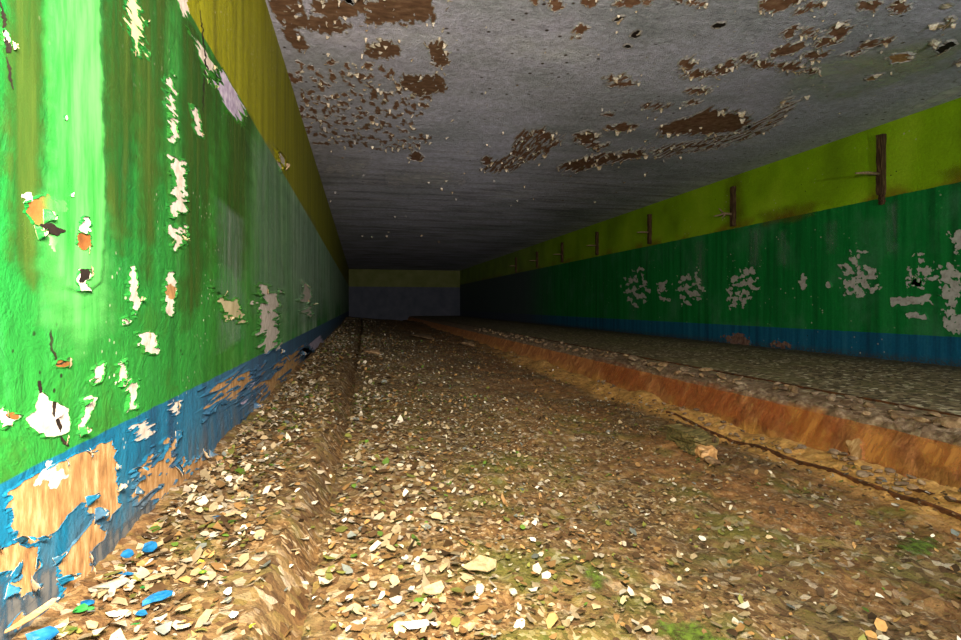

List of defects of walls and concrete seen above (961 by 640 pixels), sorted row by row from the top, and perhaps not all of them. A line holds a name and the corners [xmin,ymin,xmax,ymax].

peeling [119,0,152,62]
peeling [177,0,248,128]
peeling [268,0,453,163]
peeling [479,0,917,182]
peeling [927,2,961,68]
peeling [160,69,206,253]
peeling [620,266,707,308]
peeling [725,259,764,311]
peeling [797,272,809,291]
peeling [825,228,961,335]
peeling [165,279,325,425]
peeling [0,264,219,640]